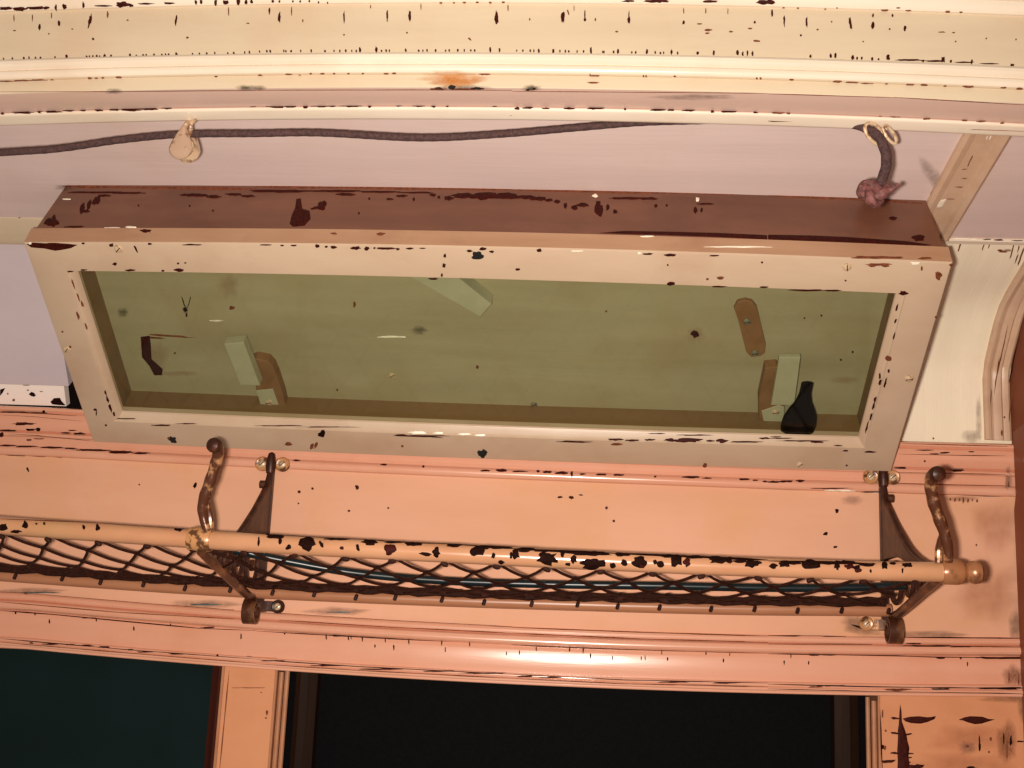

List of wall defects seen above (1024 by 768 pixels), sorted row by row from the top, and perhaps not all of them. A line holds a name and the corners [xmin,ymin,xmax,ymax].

spalling [516,47,678,55]
spalling [851,54,1014,66]
corrosion [430,74,485,91]
spalling [0,385,148,472]
spalling [481,469,624,477]
spalling [739,478,879,493]
peeling [0,519,183,533]
peeling [257,534,912,573]
spalling [905,643,1020,659]